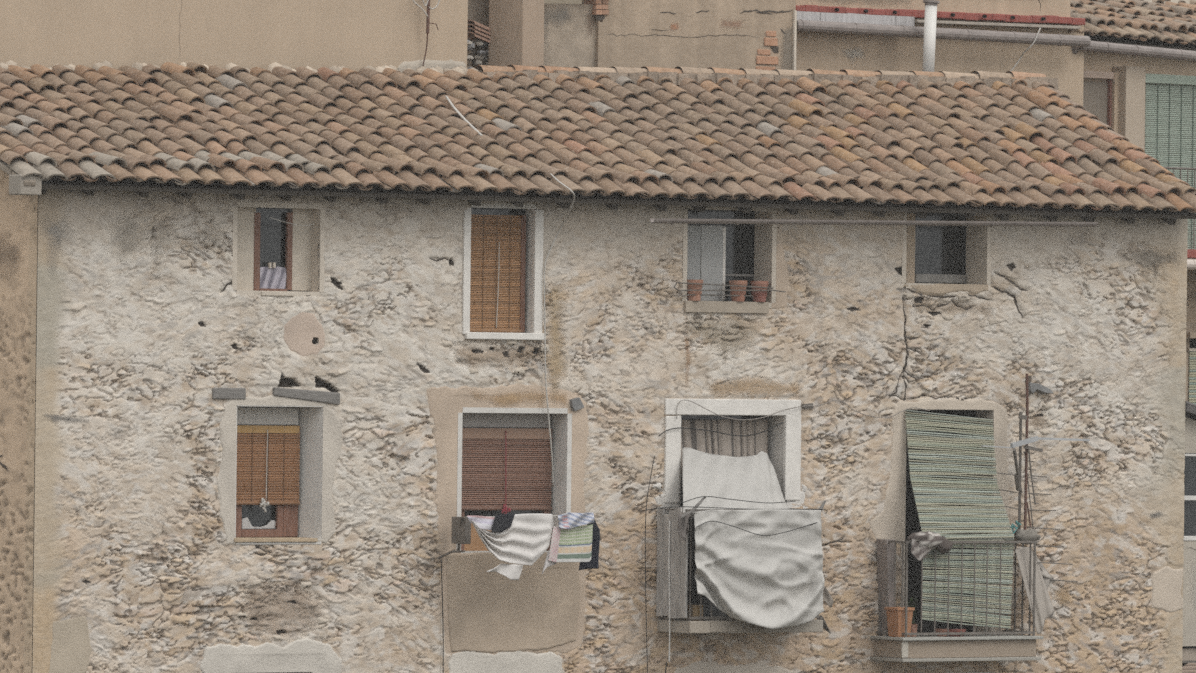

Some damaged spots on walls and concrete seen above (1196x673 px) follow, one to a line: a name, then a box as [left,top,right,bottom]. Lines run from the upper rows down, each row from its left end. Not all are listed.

crack [890,273,1028,401]